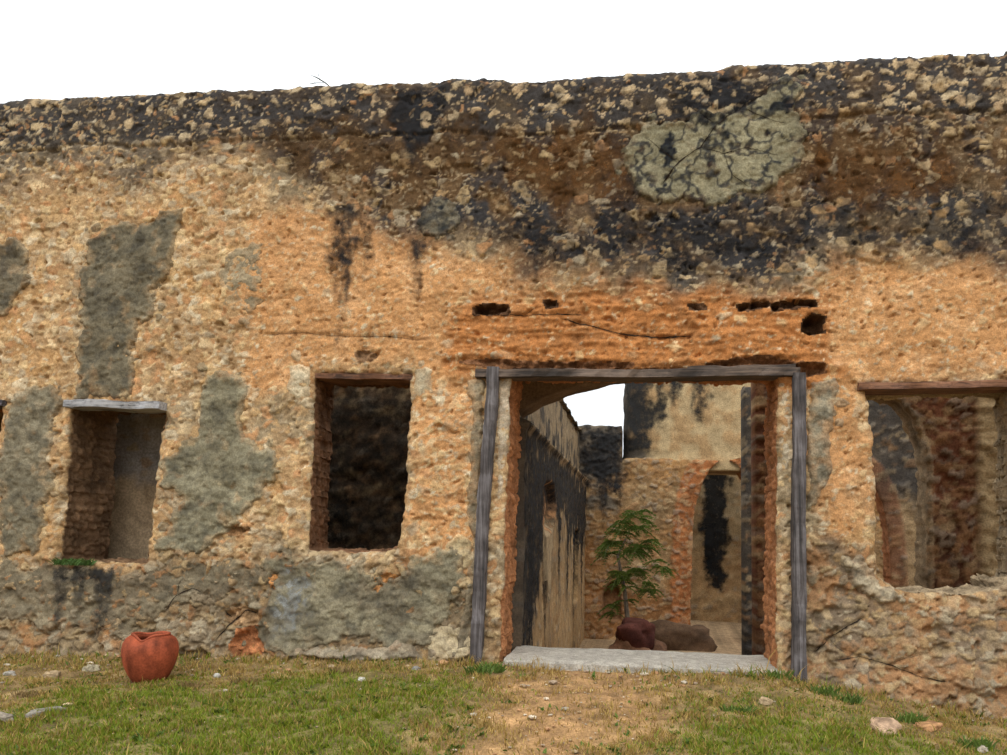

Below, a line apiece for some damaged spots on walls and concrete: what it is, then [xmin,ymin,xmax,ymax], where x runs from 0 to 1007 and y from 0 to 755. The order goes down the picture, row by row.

crack [648,93,784,186]
water stain [328,204,359,300]
water stain [497,197,826,271]
water stain [828,211,877,244]
water stain [923,220,980,250]
water stain [522,382,714,646]